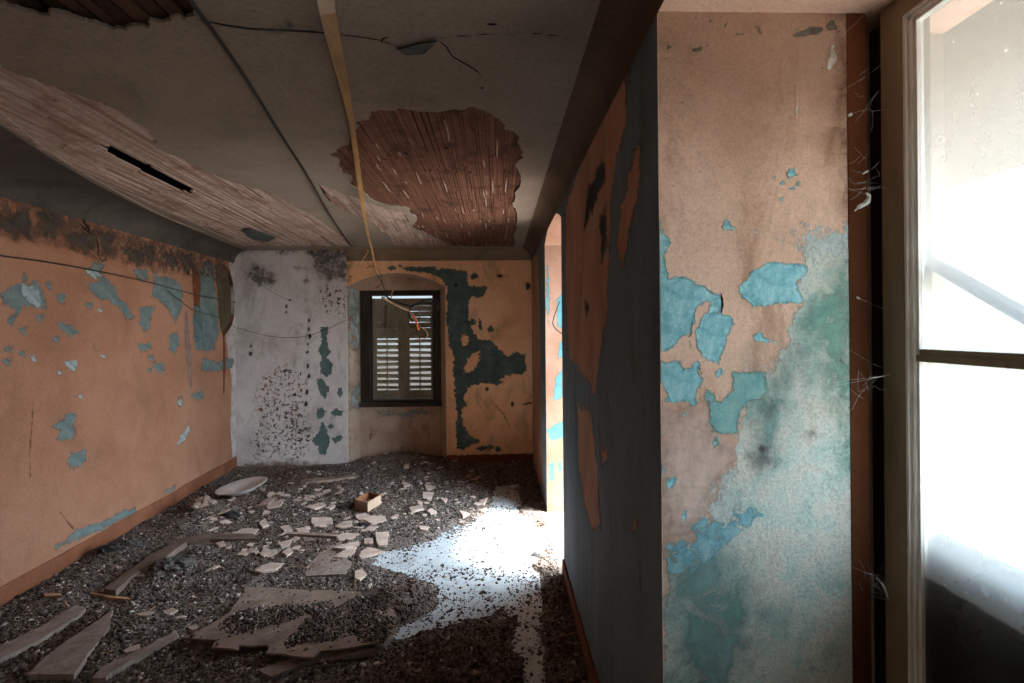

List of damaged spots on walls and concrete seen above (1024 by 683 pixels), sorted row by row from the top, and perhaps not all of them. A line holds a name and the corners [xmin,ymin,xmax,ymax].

crack [199,19,396,46]
crack [438,23,497,89]
peeling [0,272,66,335]
peeling [52,412,86,469]
leakage [0,200,226,281]
peeling [85,260,236,458]
leakage [251,285,346,461]
peeling [312,287,360,455]
peeling [363,74,640,532]
peeling [660,222,769,447]
leakage [663,222,853,683]
peeling [739,261,808,308]